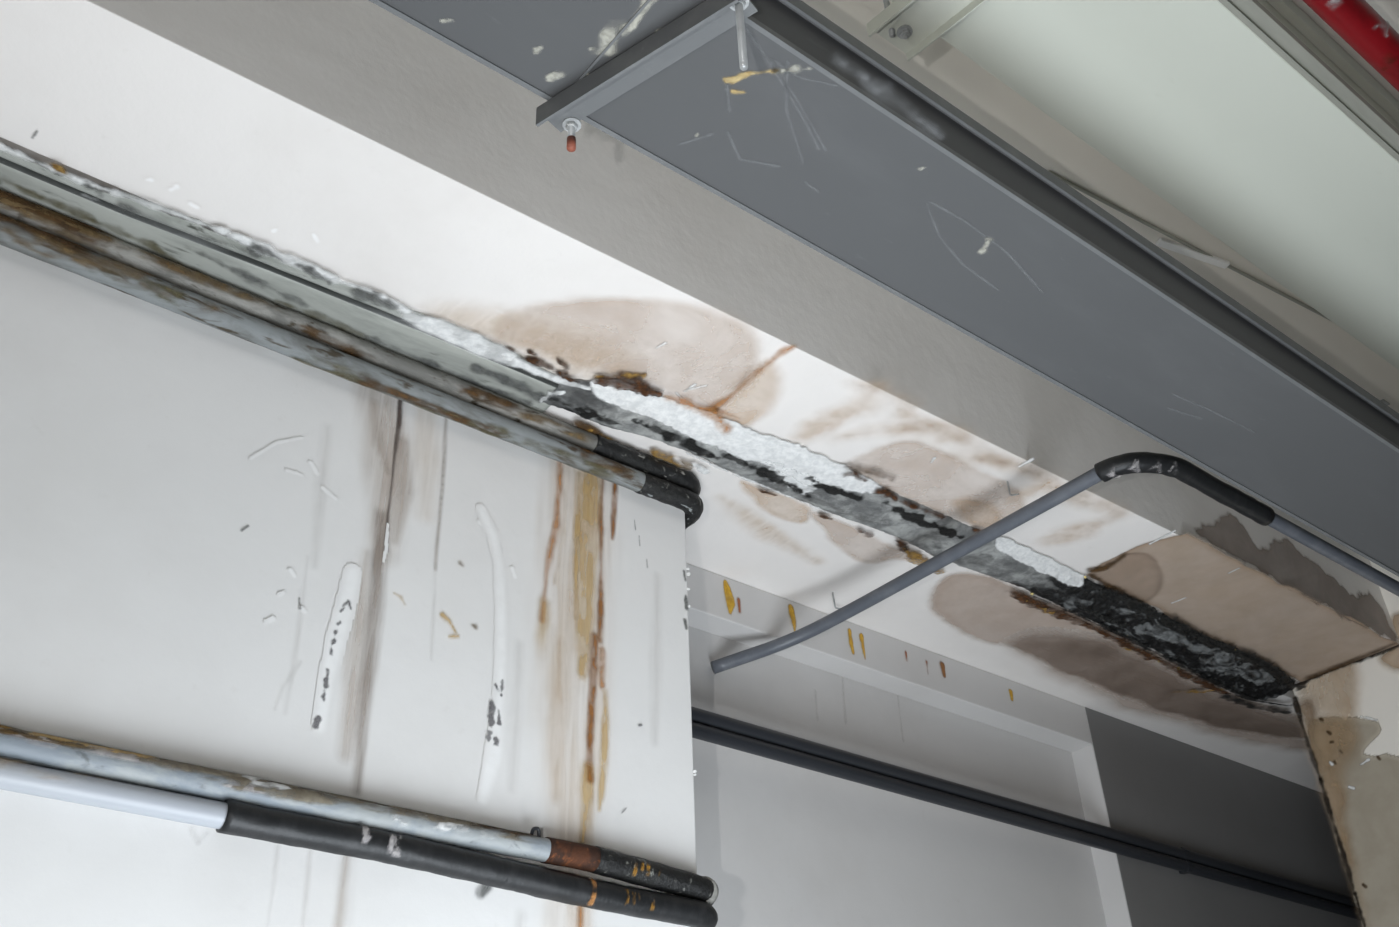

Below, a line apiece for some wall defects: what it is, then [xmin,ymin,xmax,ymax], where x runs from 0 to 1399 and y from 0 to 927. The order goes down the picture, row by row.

rust [0,189,253,301]
rust [302,326,361,357]
rust [293,358,507,436]
leakage [575,420,611,440]
rust [505,347,731,432]
leakage [650,450,709,474]
leakage [817,514,873,538]
rust [464,386,632,840]
leakage [1088,514,1399,716]
leakage [884,540,1346,844]
peeling [1292,645,1399,927]